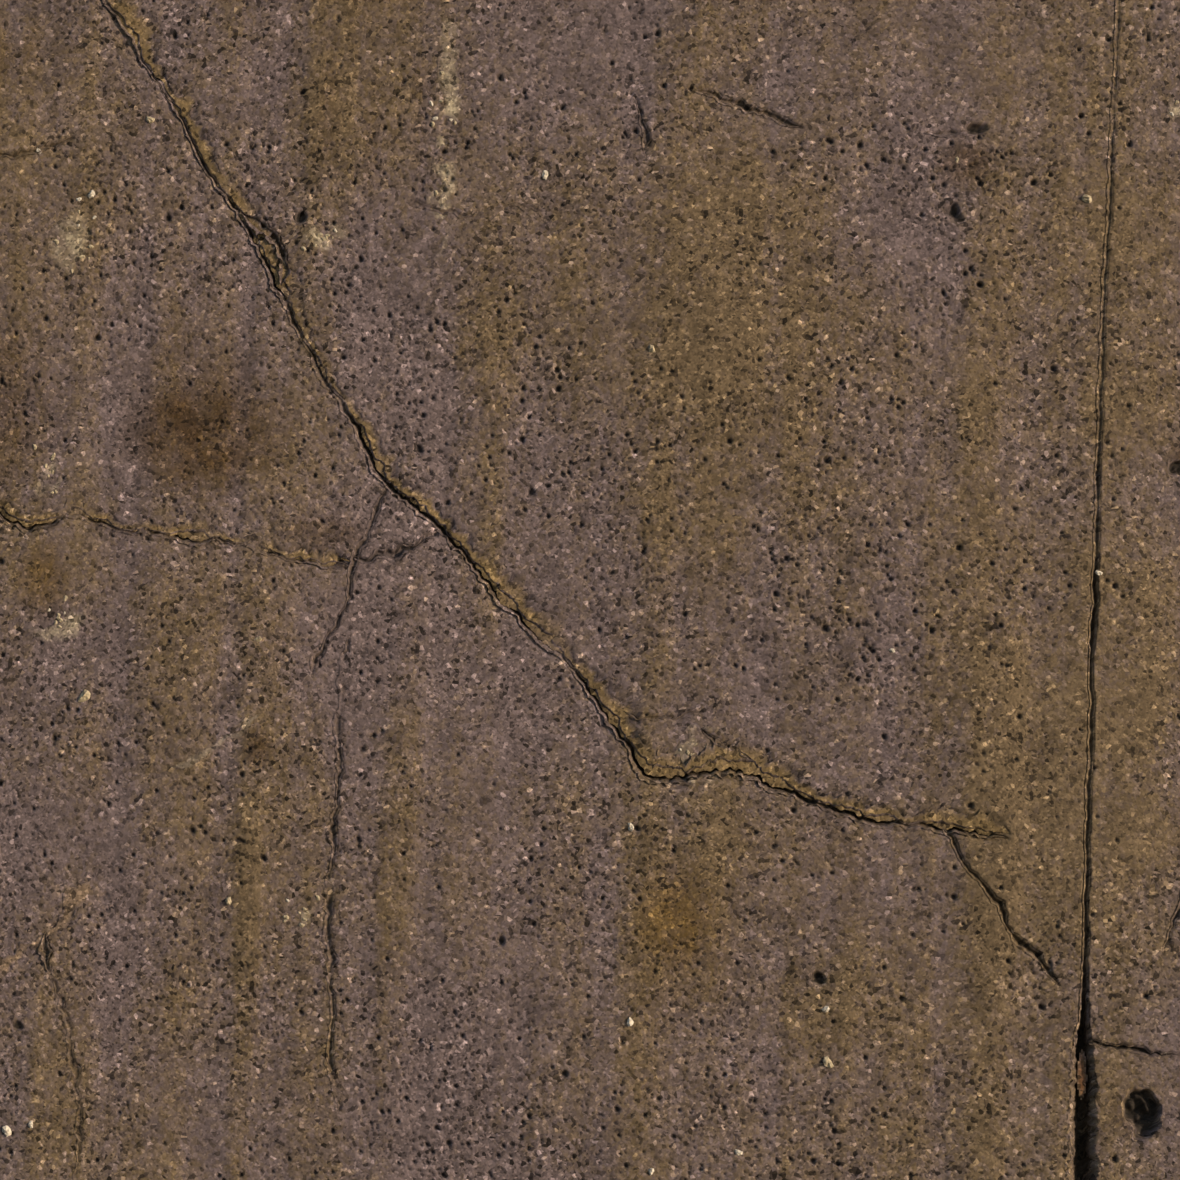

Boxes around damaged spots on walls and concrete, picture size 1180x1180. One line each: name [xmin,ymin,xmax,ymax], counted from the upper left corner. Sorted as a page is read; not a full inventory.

damp [0,0,102,118]
damp [298,223,356,251]
damp [408,8,462,263]
damp [101,301,310,517]
crack [0,0,1058,983]
crack [1064,0,1180,1180]
crack [322,639,351,1110]